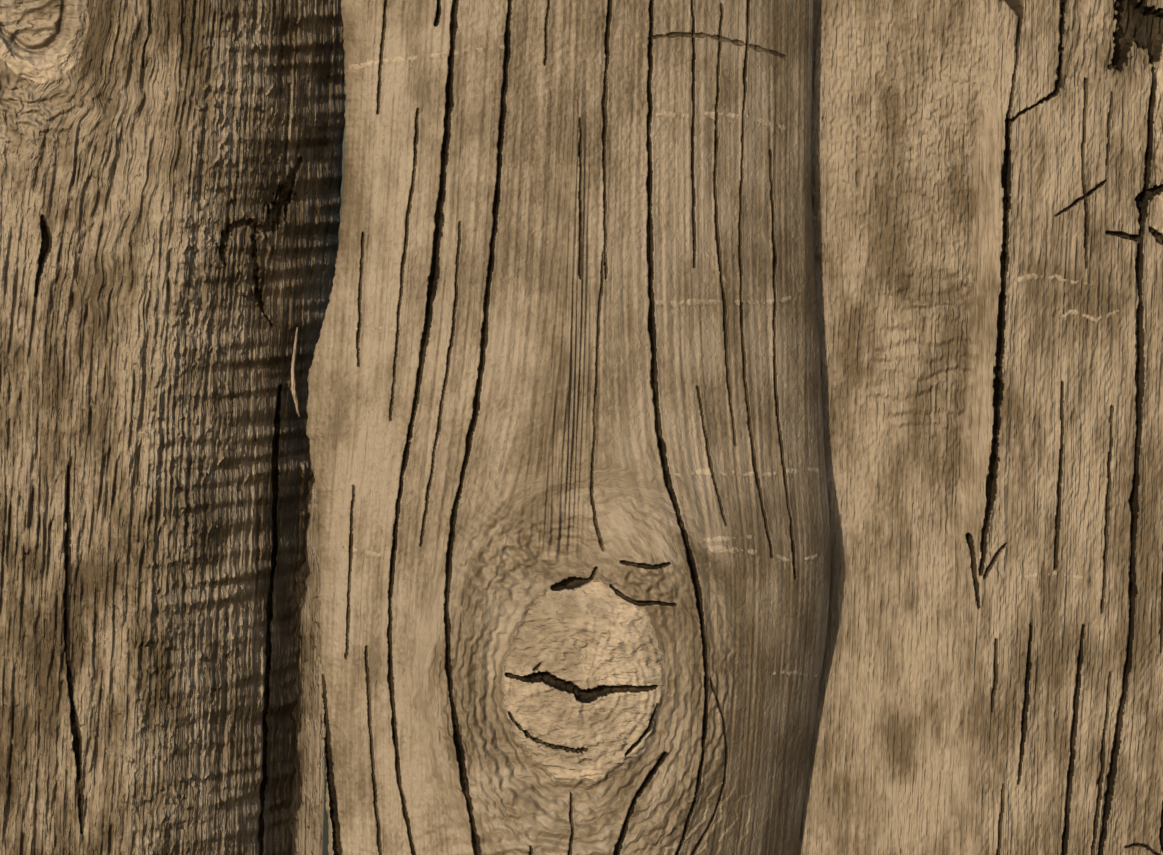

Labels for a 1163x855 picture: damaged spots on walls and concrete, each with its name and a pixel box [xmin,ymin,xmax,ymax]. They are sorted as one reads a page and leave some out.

crack [257,384,282,855]
crack [321,0,512,855]
crack [543,0,551,65]
crack [504,662,669,855]
crack [550,0,797,855]
crack [965,0,1163,855]